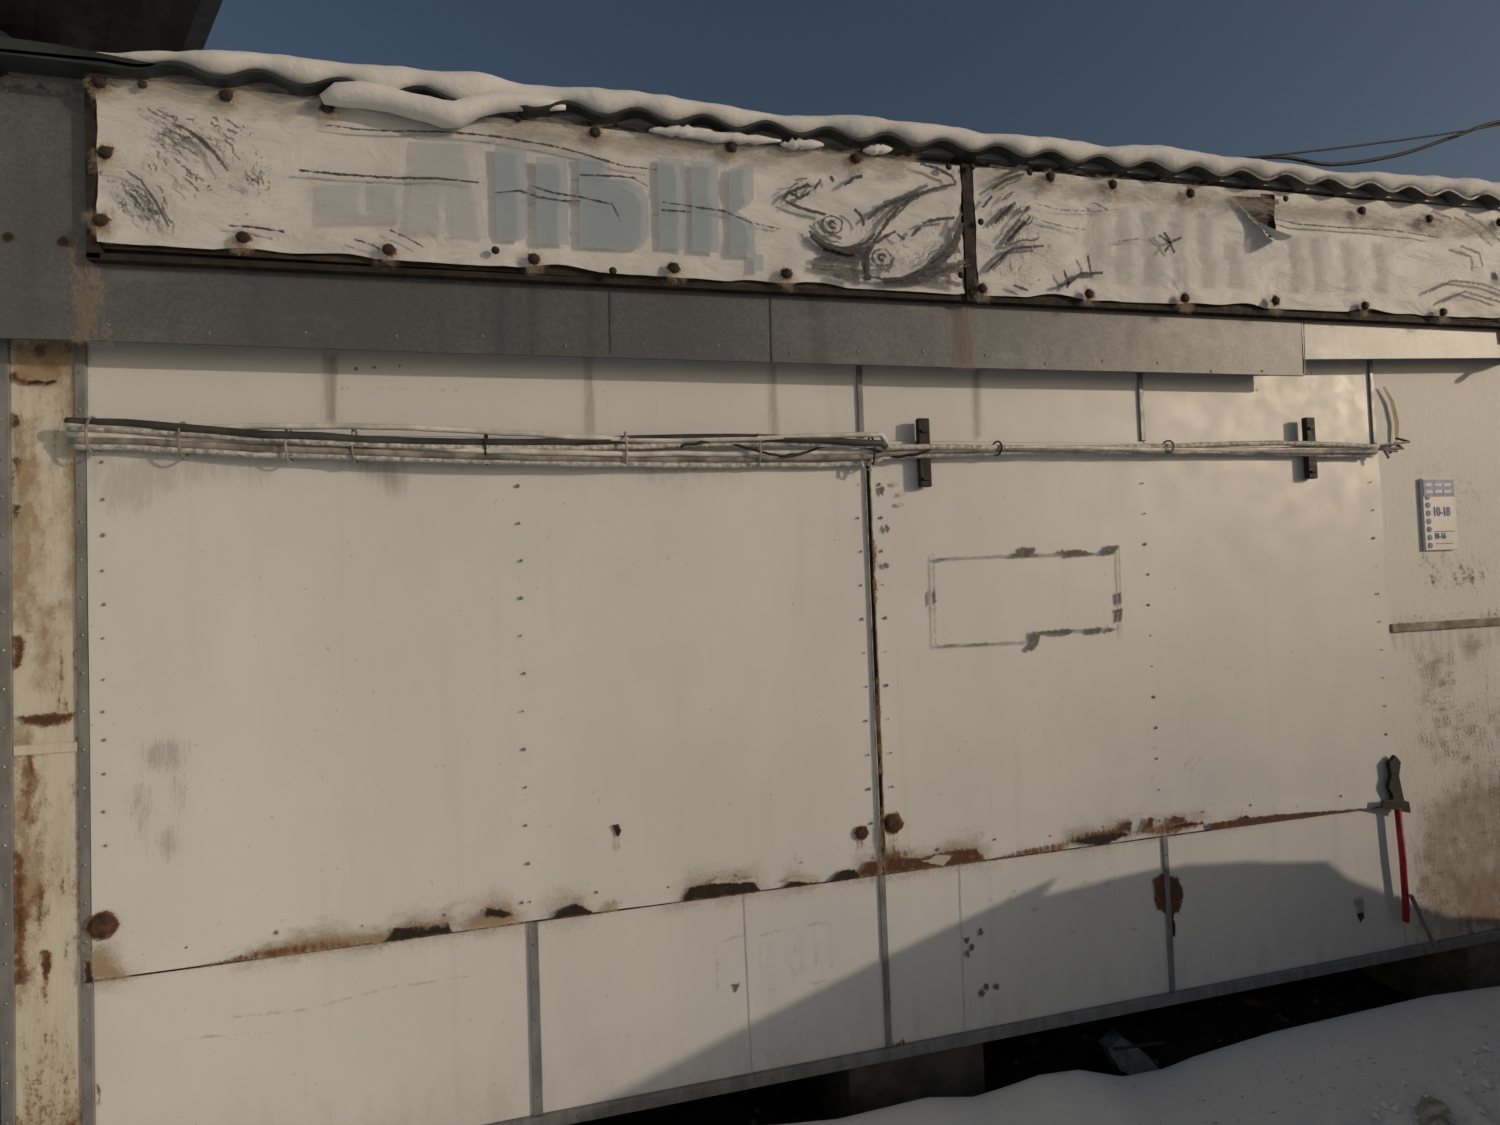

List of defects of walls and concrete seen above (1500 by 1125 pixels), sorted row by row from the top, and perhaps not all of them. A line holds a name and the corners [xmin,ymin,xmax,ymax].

corrosion [11,413,77,686]
corrosion [875,678,883,776]
corrosion [1409,643,1500,932]
corrosion [13,711,152,1006]
corrosion [201,933,387,968]
corrosion [468,904,520,930]
corrosion [710,876,762,897]
corrosion [854,807,1376,874]
corrosion [1153,874,1184,937]
corrosion [15,1063,102,1125]